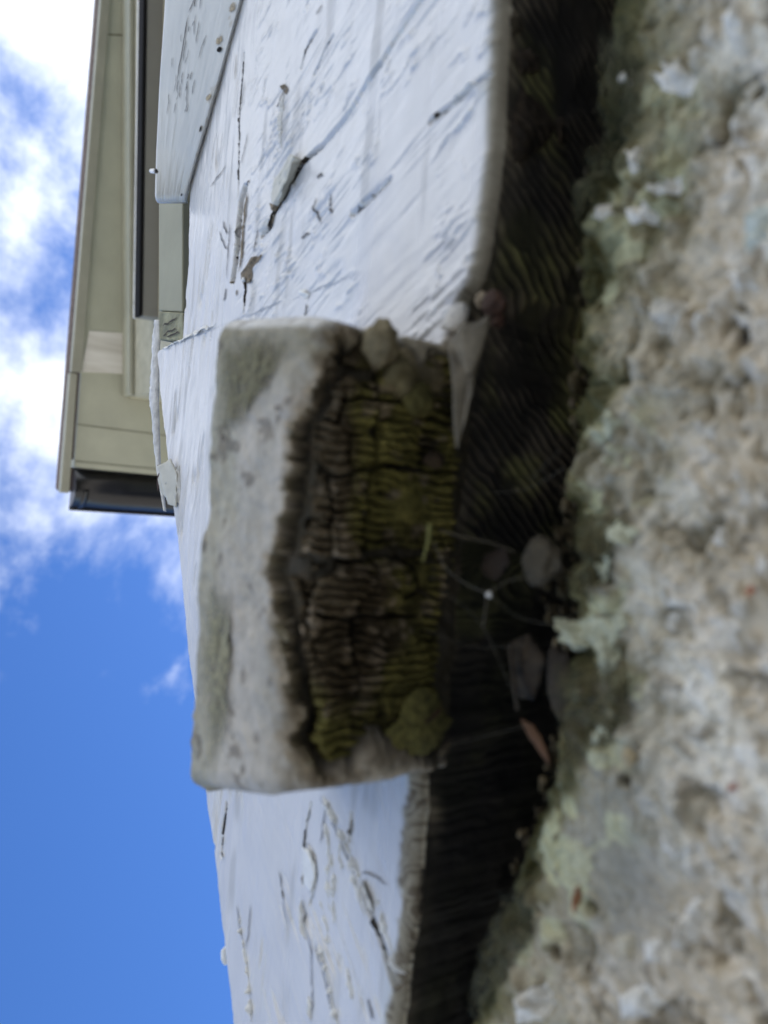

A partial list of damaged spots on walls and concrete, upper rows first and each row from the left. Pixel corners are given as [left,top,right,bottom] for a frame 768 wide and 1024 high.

peeling [223,153,317,307]